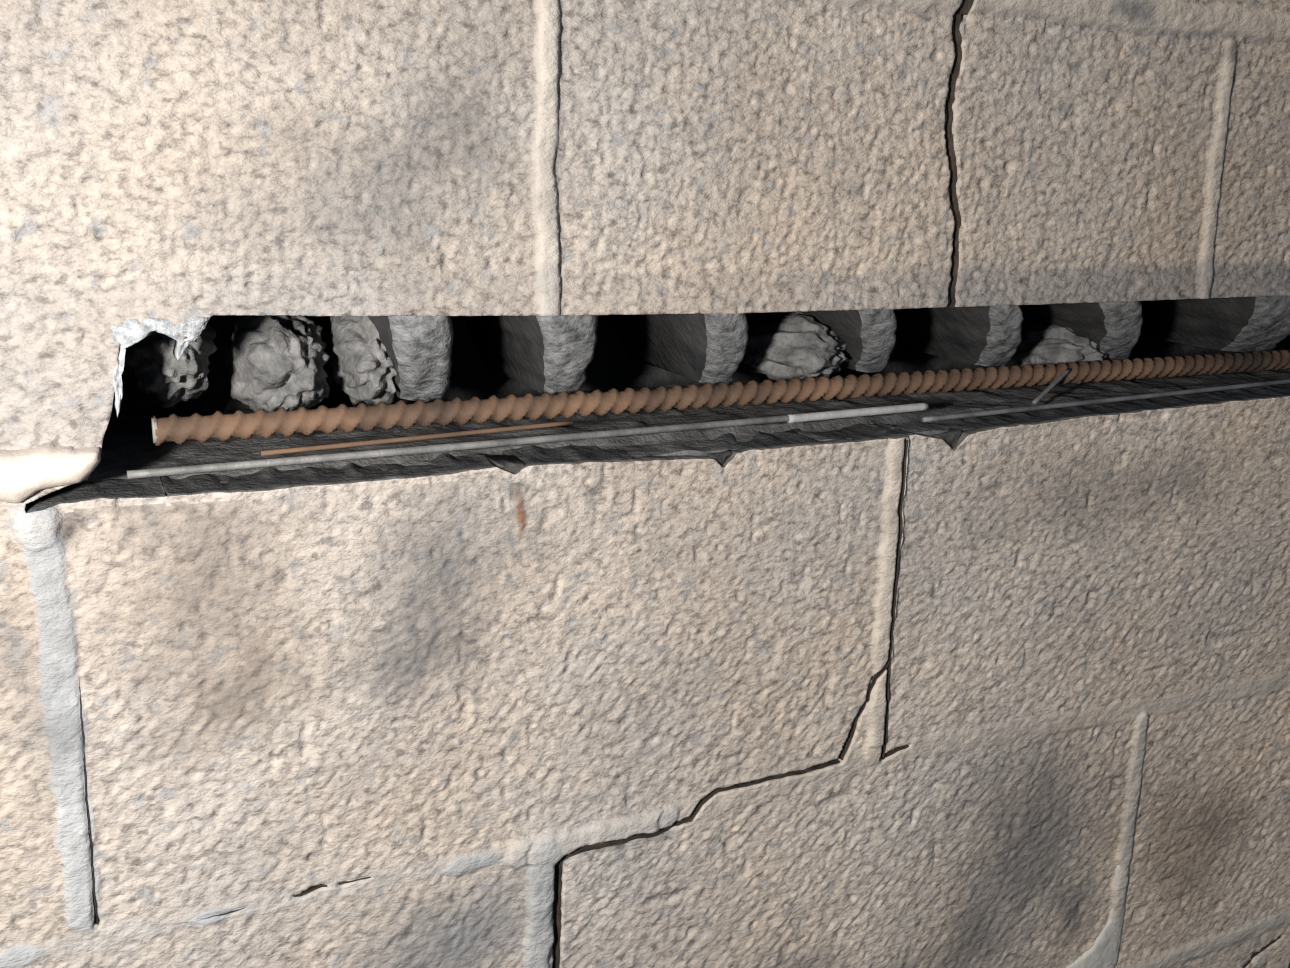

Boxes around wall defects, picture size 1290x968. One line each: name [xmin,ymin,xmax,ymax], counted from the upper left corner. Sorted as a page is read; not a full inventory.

crack [945,0,974,308]
spalling [111,317,209,418]
spalling [151,350,1290,449]
spalling [485,455,525,474]
spalling [707,450,732,466]
crack [552,439,909,968]
crack [201,907,245,920]
crack [293,877,370,897]